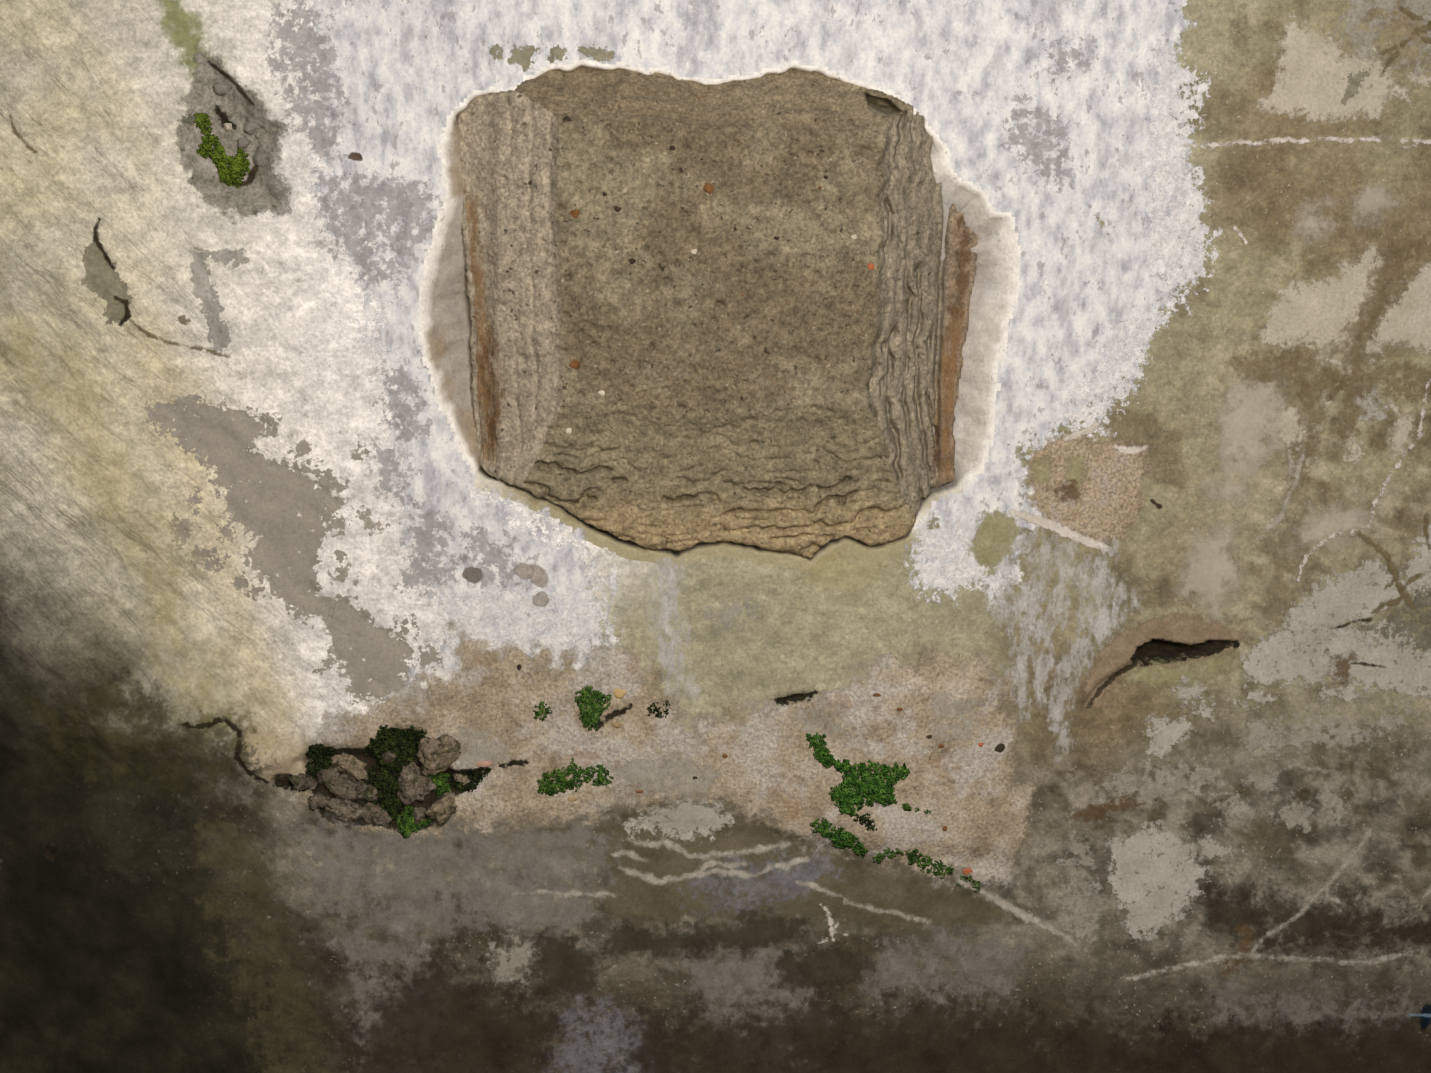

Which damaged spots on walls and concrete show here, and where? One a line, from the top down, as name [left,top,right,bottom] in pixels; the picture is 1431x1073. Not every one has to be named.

peeling [1001,94,1078,189]
crack [1184,136,1431,149]
water stain [287,0,1223,760]
peeling [141,0,1036,888]
crack [183,717,269,783]
crack [534,839,928,943]
water stain [296,805,1431,1073]
crack [958,879,1074,943]